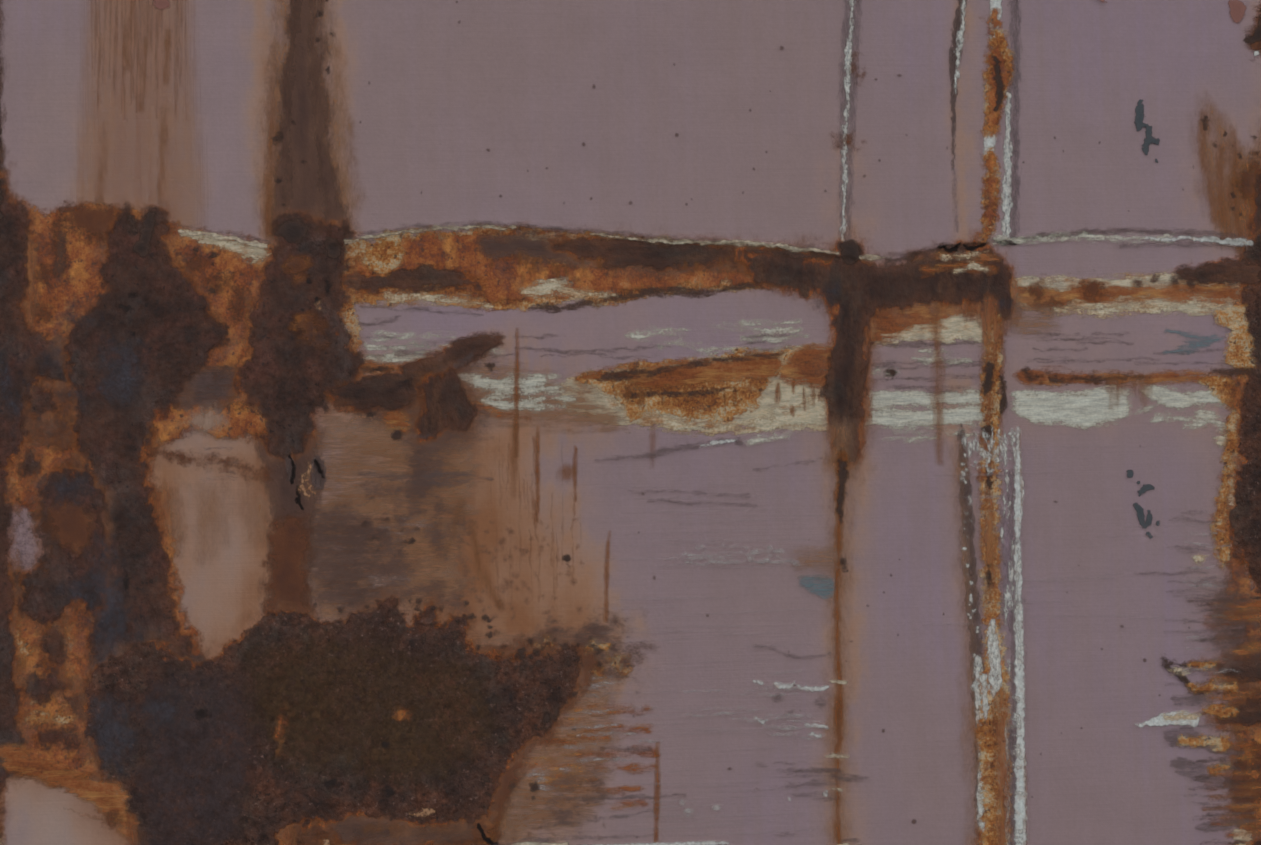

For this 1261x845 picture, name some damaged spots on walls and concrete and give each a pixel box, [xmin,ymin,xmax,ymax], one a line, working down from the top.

corrosion [161,0,834,414]
corrosion [977,8,1014,244]
corrosion [1202,107,1261,251]
corrosion [1228,0,1261,56]
corrosion [4,376,660,845]
corrosion [556,345,852,845]